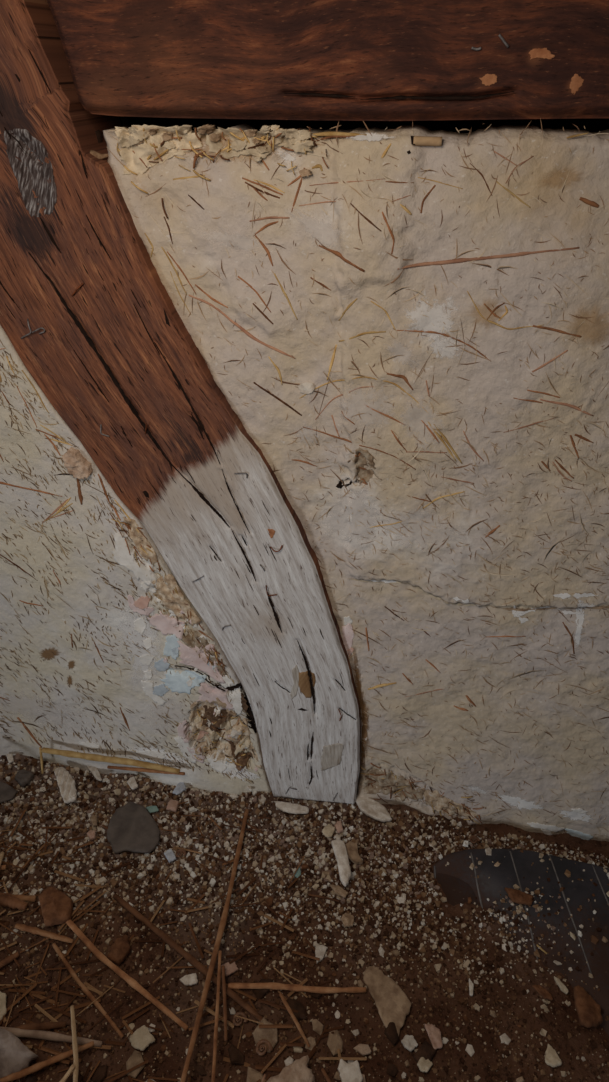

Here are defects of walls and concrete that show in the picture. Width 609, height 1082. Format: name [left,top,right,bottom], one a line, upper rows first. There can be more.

spalling [114,124,329,194]
spalling [336,447,376,489]
peeling [111,517,262,775]